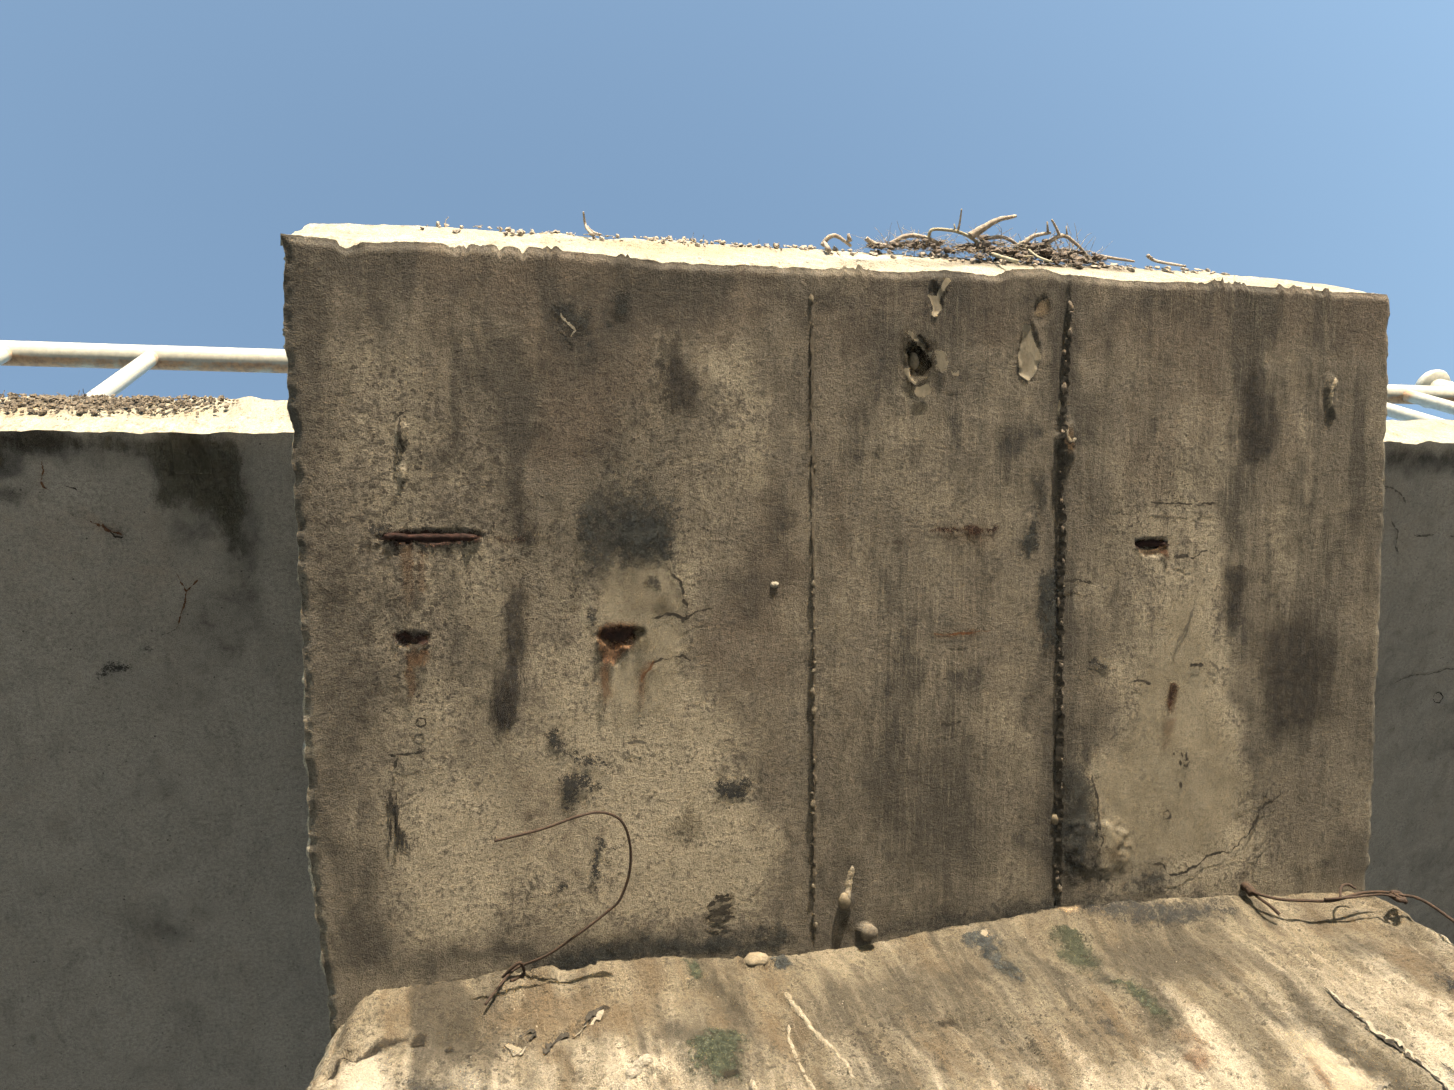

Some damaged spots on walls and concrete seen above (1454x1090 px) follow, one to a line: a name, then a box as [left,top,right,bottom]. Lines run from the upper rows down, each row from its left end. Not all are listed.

water stain [1225,565,1248,624]
water stain [490,577,528,734]
water stain [1262,606,1334,736]
spalling [328,1033,427,1080]
peeling [504,1029,537,1056]